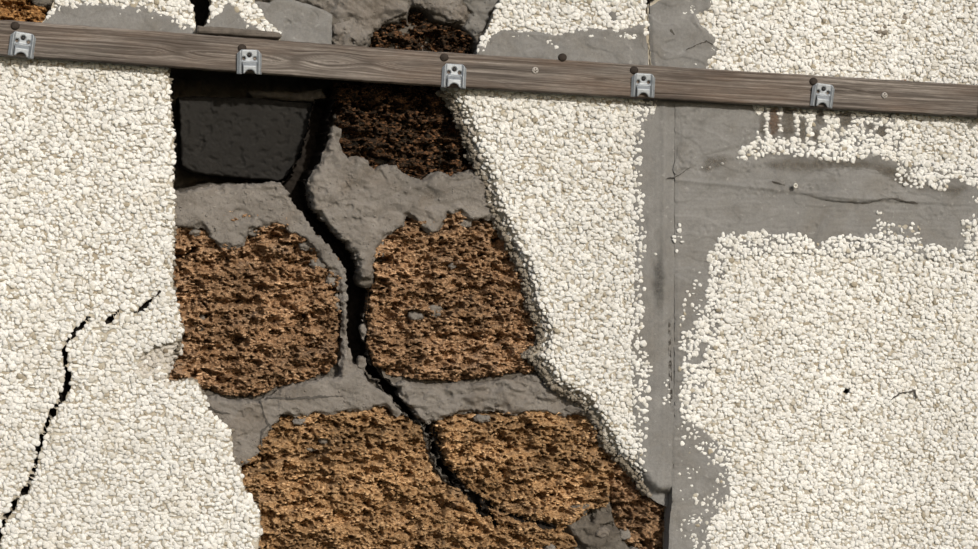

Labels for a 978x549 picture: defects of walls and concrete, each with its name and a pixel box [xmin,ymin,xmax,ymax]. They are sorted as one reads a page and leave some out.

spalling [0,0,718,69]
crack [0,290,161,541]
crack [260,395,343,446]
crack [281,98,556,530]
spalling [133,68,978,549]